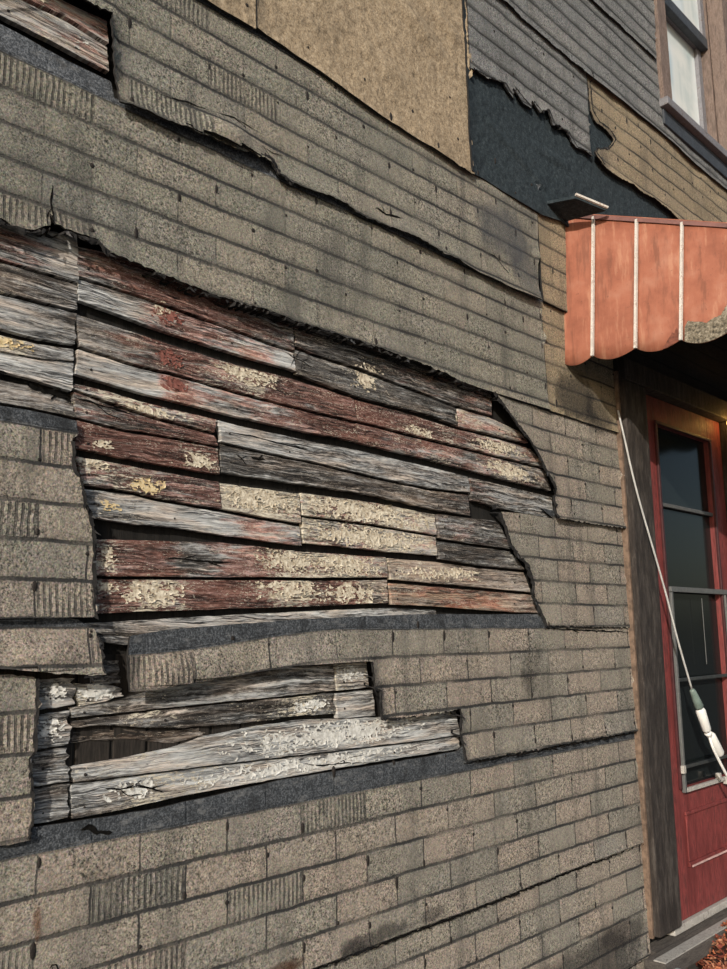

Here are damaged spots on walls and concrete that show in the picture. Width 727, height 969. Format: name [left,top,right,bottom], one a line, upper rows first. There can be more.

crack [46,186,58,225]
peeling [214,363,277,390]
peeling [350,363,384,392]
peeling [118,403,178,420]
peeling [183,452,217,470]
peeling [471,433,555,485]
peeling [130,477,166,495]
peeling [217,486,431,604]
peeling [93,546,185,608]
peeling [36,676,116,704]
peeling [183,699,425,790]
peeling [103,777,157,802]